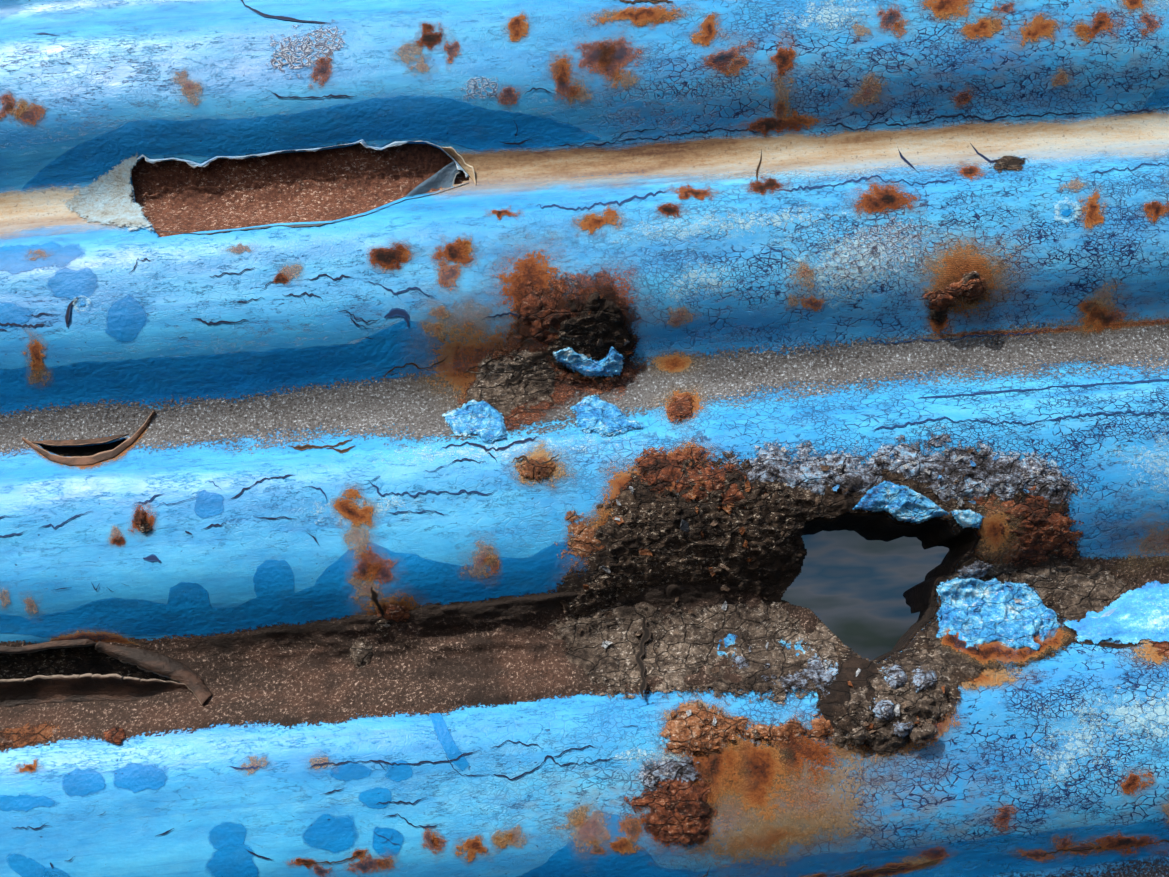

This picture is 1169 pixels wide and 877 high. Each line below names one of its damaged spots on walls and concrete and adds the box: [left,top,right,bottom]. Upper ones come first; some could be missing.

rust [508,14,529,41]
rust [549,4,683,105]
rust [692,13,757,76]
rust [130,34,1169,237]
rust [369,241,412,273]
rust [421,237,697,443]
peeling [853,480,986,529]
rust [1080,521,1169,589]
peeling [936,560,1061,652]
rust [0,479,960,868]
spalling [717,634,878,742]
crack [1017,839,1169,859]